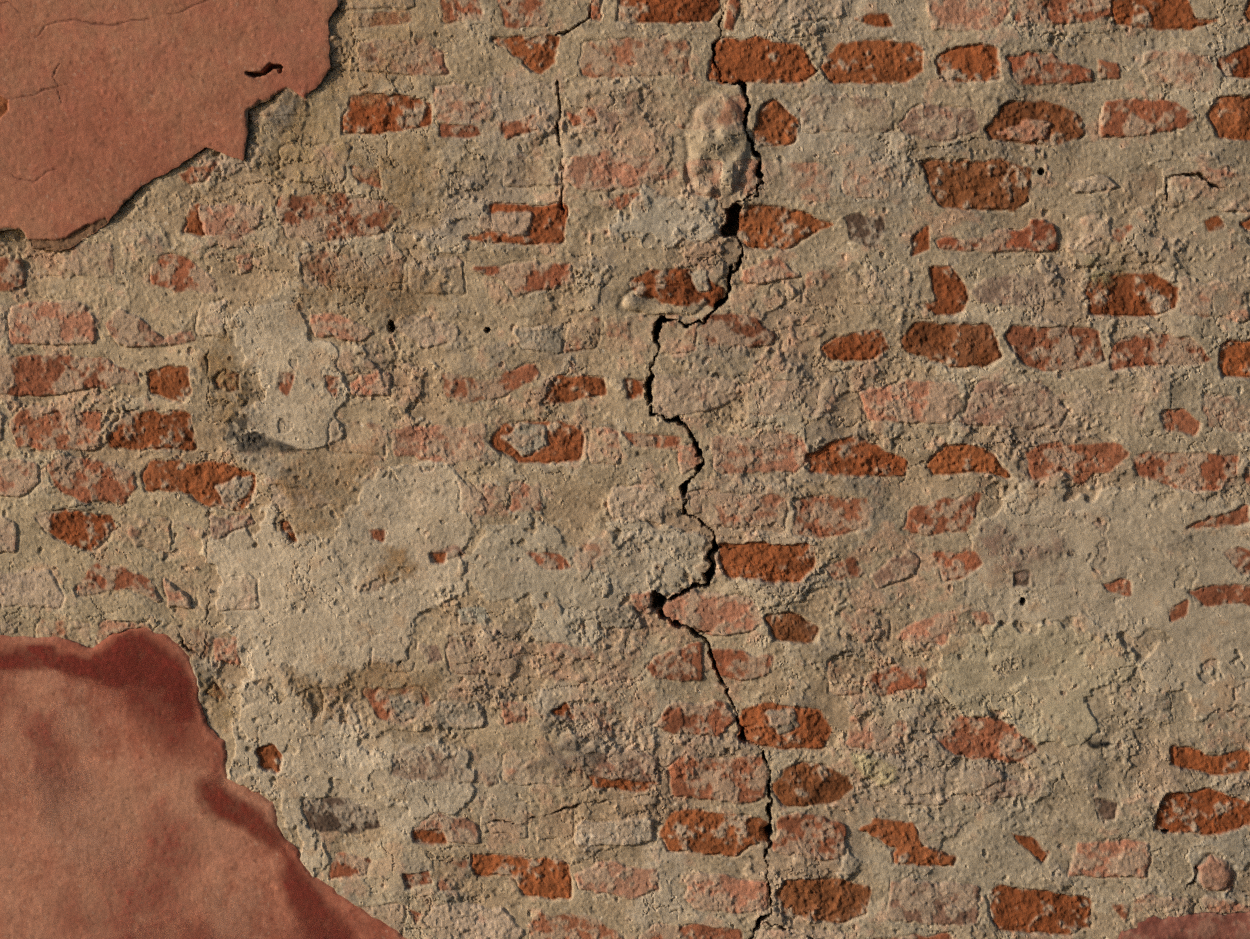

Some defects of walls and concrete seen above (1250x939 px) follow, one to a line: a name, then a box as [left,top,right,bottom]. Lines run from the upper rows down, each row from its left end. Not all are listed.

spalling [709,37,924,85]
peeling [0,0,341,252]
spalling [921,159,1033,213]
spalling [822,266,1002,369]
spalling [108,365,256,513]
crack [624,12,814,939]
spalling [718,542,817,585]
peeling [0,627,407,939]
spalling [737,702,854,808]
spalling [1155,746,1250,837]
spalling [776,878,872,925]
spalling [989,885,1092,937]